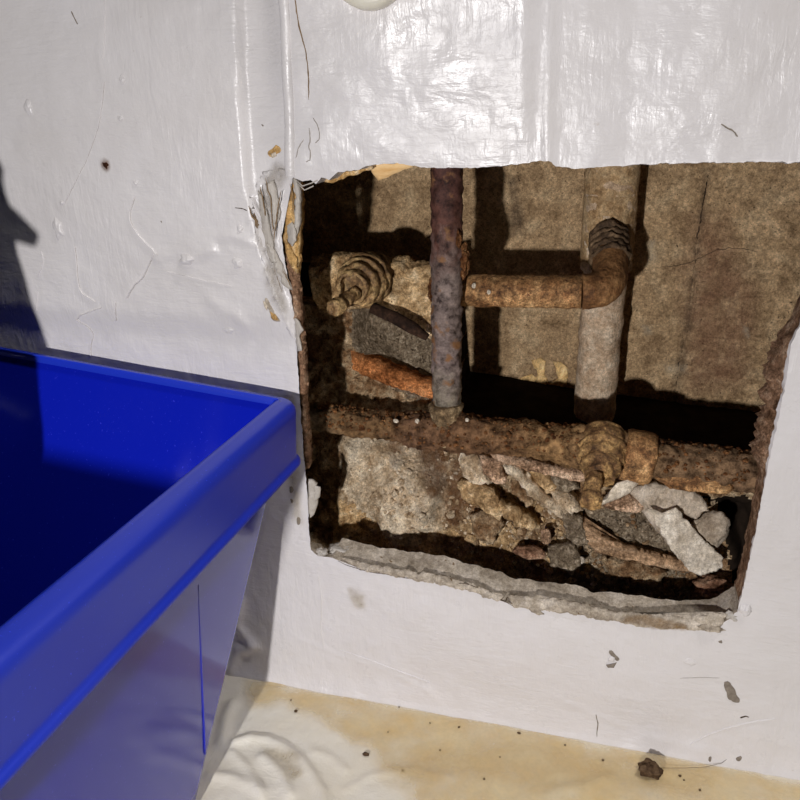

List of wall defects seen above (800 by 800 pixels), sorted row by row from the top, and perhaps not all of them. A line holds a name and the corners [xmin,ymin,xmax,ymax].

rust [456,229,471,281]
peeling [248,168,318,469]
peeling [297,479,321,525]
rust [422,449,465,525]
flaking render [602,480,639,505]
rust [655,476,735,494]
flaking render [315,542,752,643]
damp [254,682,800,800]